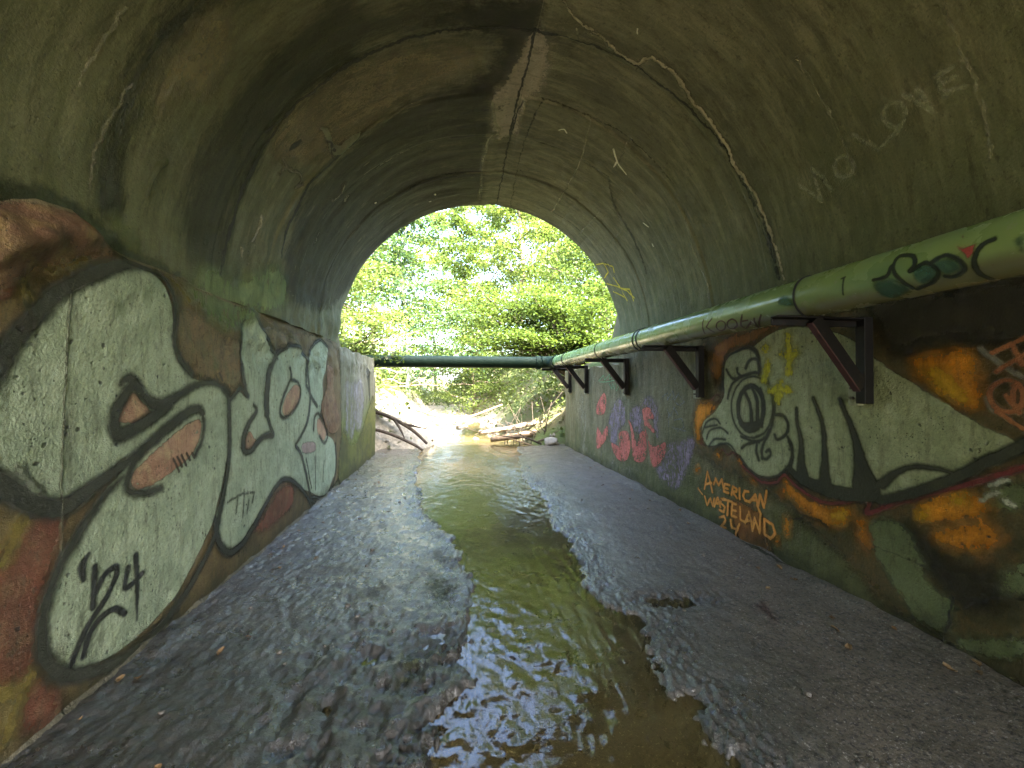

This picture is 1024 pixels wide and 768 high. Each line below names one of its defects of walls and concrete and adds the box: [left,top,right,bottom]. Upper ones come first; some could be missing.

damp [271,0,550,308]
crack [220,0,785,281]